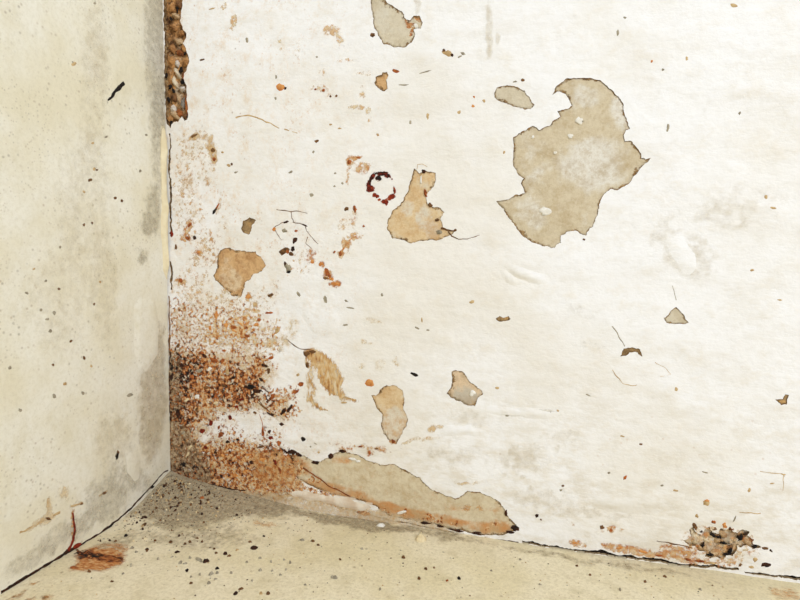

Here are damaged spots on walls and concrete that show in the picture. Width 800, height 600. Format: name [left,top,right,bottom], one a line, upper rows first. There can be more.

peeling [371,0,423,48]
spalling [163,0,189,128]
corrosion [346,156,396,206]
peeling [387,164,479,243]
peeling [494,78,650,248]
peeling [213,248,266,297]
corrosion [168,133,371,516]
peeling [371,385,408,444]
peeling [447,370,483,406]
peeling [285,449,519,535]
corrosion [601,543,708,565]
spalling [658,512,773,568]